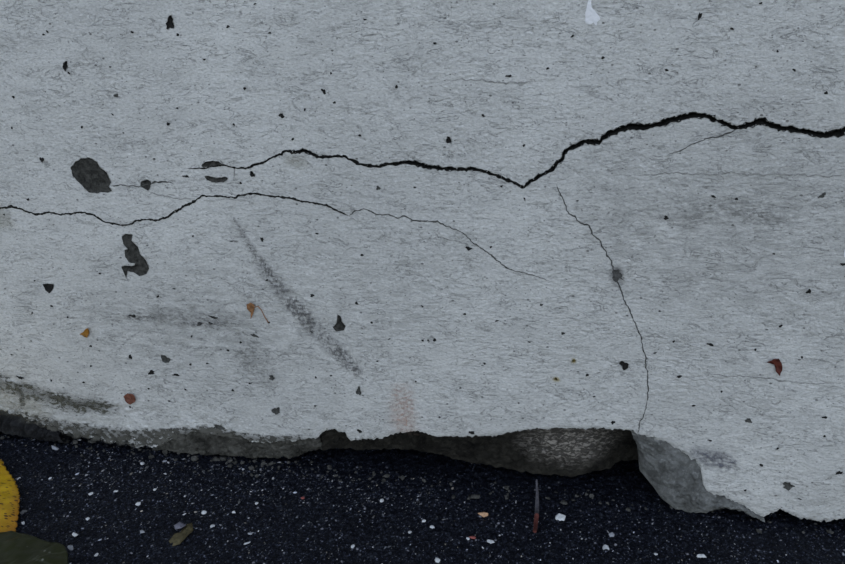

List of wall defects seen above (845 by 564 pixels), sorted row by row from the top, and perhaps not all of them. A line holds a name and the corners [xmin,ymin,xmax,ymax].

peeling [71,158,112,193]
peeling [121,234,149,277]
crack [0,181,548,281]
crack [187,112,845,432]
spalling [0,410,765,522]